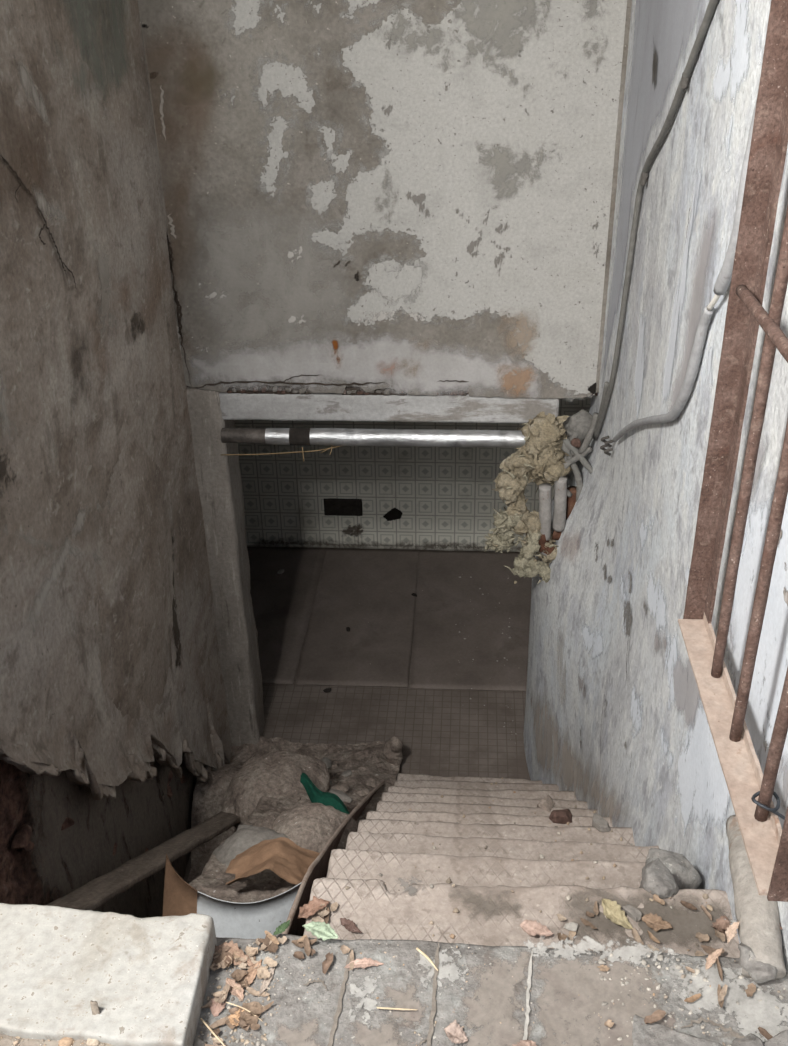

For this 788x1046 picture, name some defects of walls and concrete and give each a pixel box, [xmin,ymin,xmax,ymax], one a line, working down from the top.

peeling [228,0,288,36]
peeling [711,0,749,157]
crack [1,155,76,288]
peeling [254,0,699,396]
crack [166,231,385,388]
spalling [227,385,311,395]